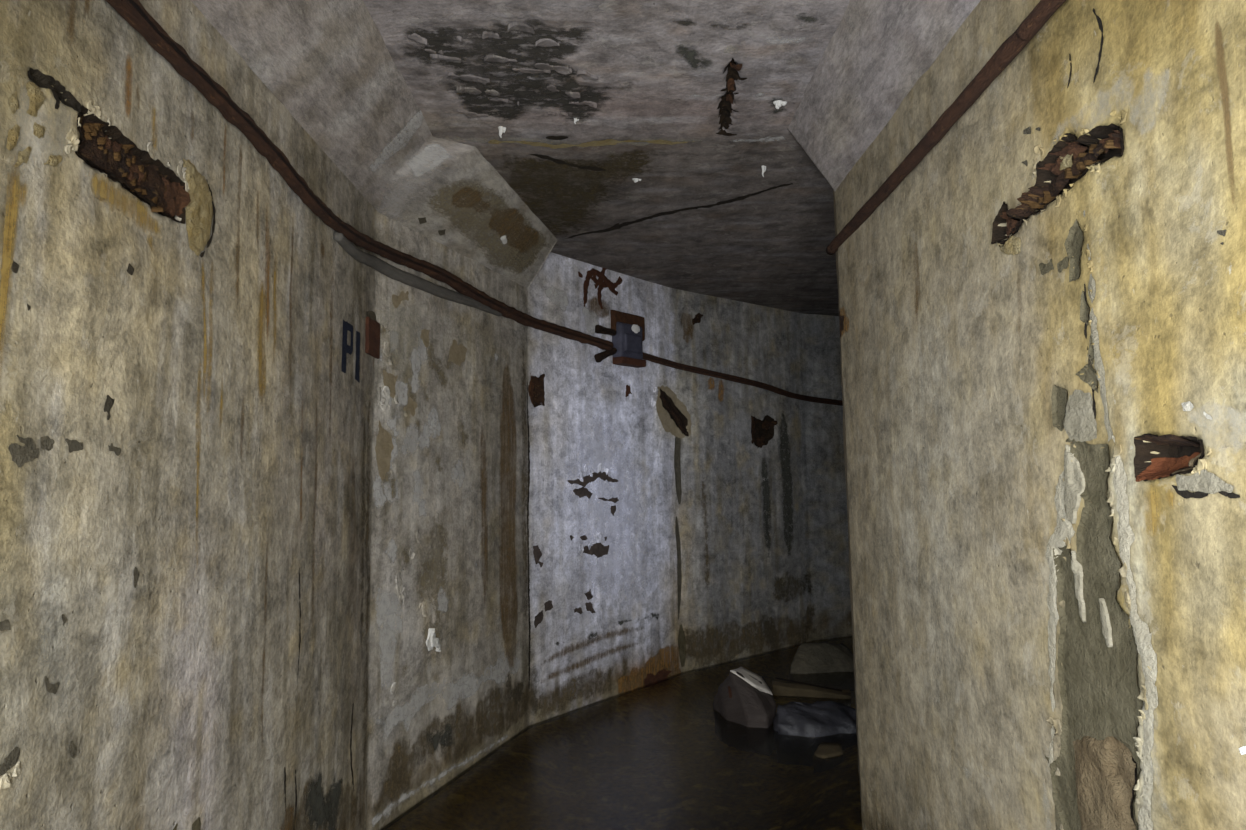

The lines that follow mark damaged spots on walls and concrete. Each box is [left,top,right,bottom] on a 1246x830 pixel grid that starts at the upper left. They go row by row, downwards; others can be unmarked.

flaking render [6,81,46,167]
spalling [991,110,1127,255]
crack [565,183,793,239]
corrosion [0,178,26,349]
spalling [44,100,215,387]
corrosion [578,268,622,317]
spalling [651,385,691,439]
spalling [751,415,778,449]
peeling [567,463,619,516]
peeling [1039,210,1240,830]
flaking render [0,747,21,790]